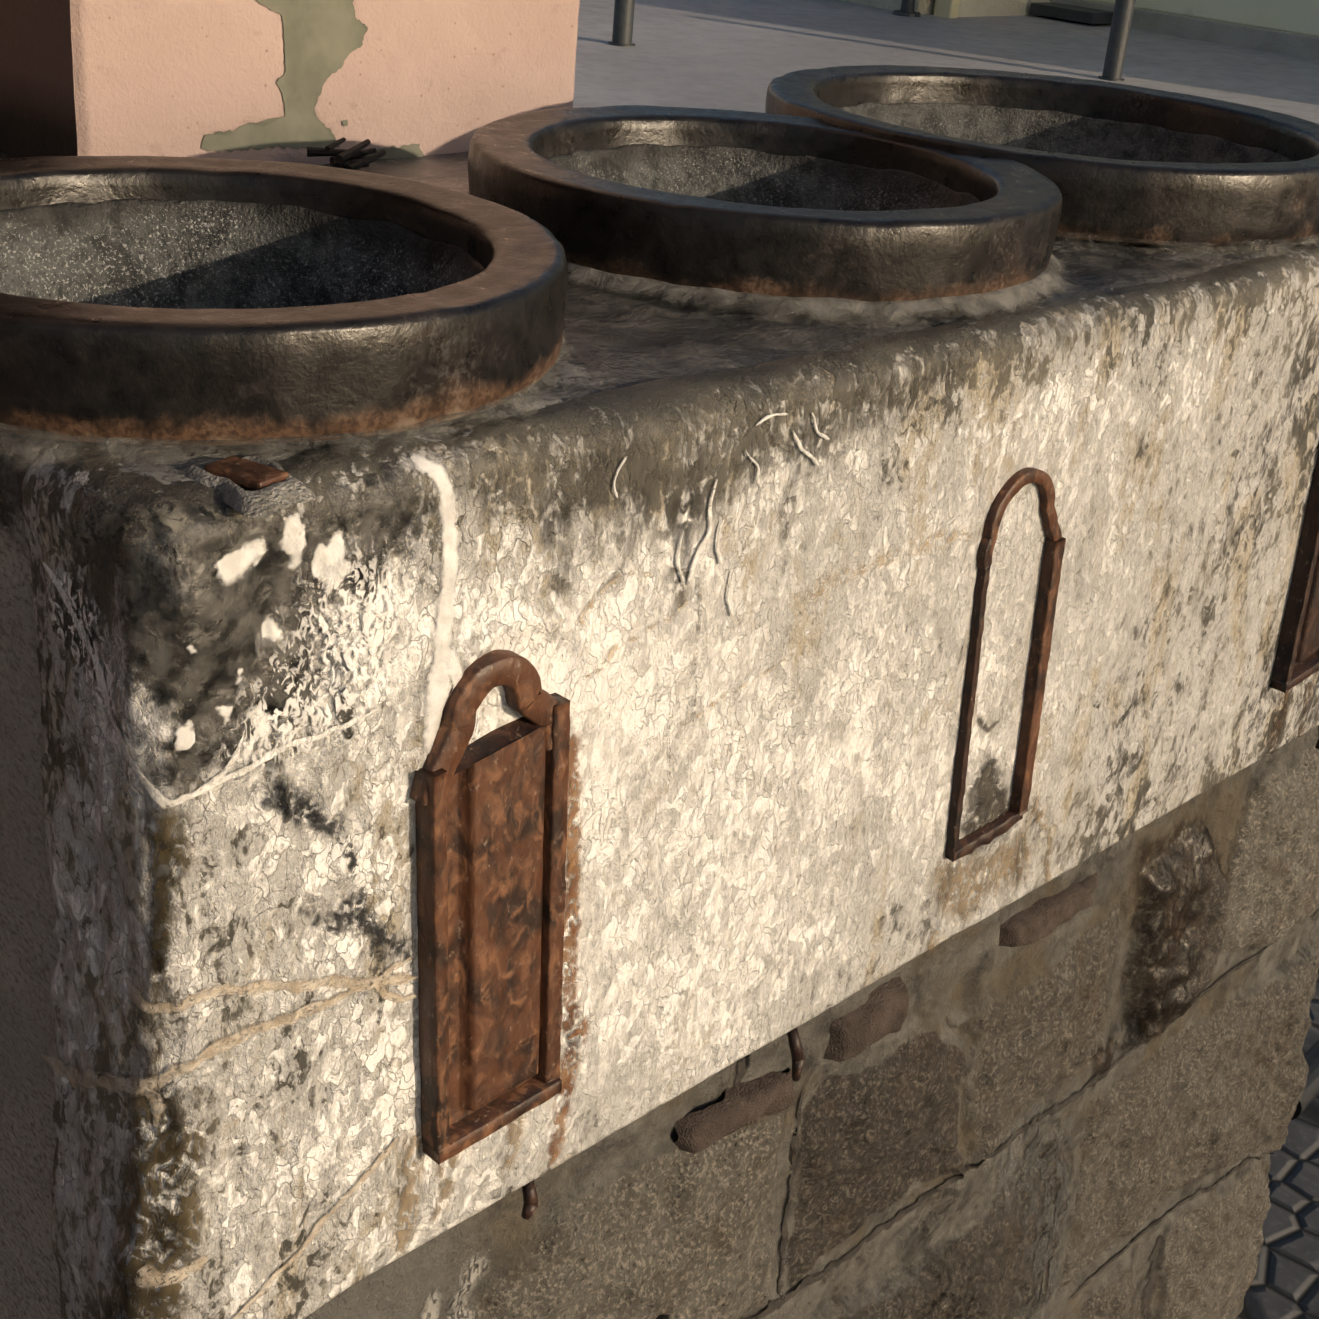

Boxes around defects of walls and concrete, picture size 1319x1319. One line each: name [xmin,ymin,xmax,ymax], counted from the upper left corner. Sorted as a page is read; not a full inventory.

peeling [201,0,368,152]
peeling [366,144,424,159]
damp [114,335,989,788]
damp [148,836,174,973]
damp [253,773,345,836]
damp [344,843,358,874]
corrosion [549,735,588,1165]
crack [42,956,419,1127]
corrosion [394,1134,423,1250]
corrosion [434,1155,457,1219]
corrosion [506,1117,523,1168]